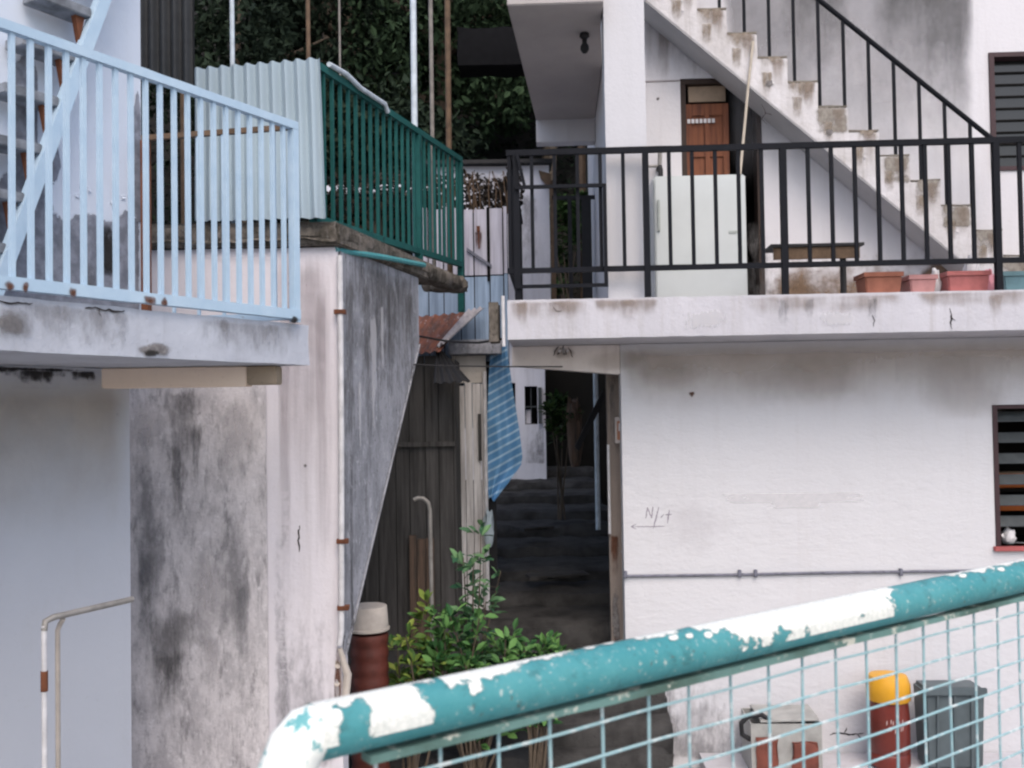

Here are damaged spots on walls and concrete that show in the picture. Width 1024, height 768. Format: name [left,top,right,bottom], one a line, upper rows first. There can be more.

damp [730,0,967,72]
mould [0,367,95,382]
spalling [140,343,168,356]
peeling [304,559,1024,749]